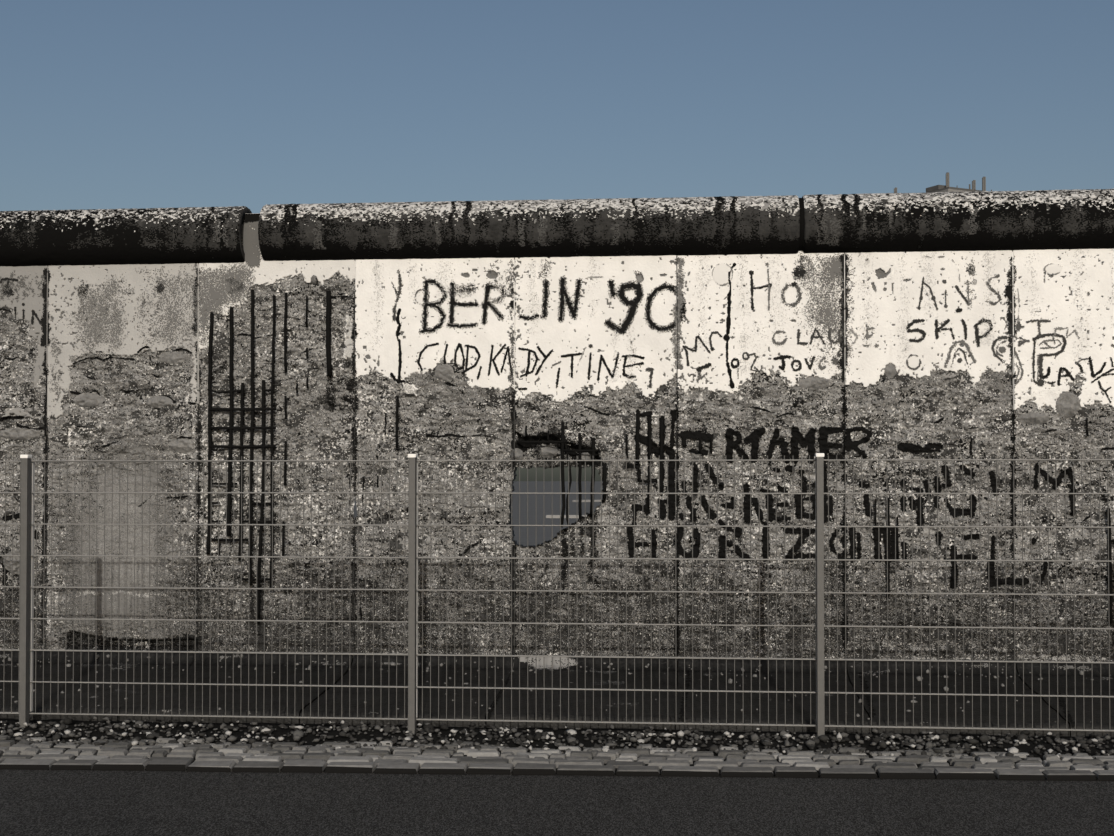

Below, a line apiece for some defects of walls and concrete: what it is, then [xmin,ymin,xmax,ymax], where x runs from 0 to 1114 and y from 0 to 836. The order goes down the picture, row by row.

spalling [0,250,1114,665]